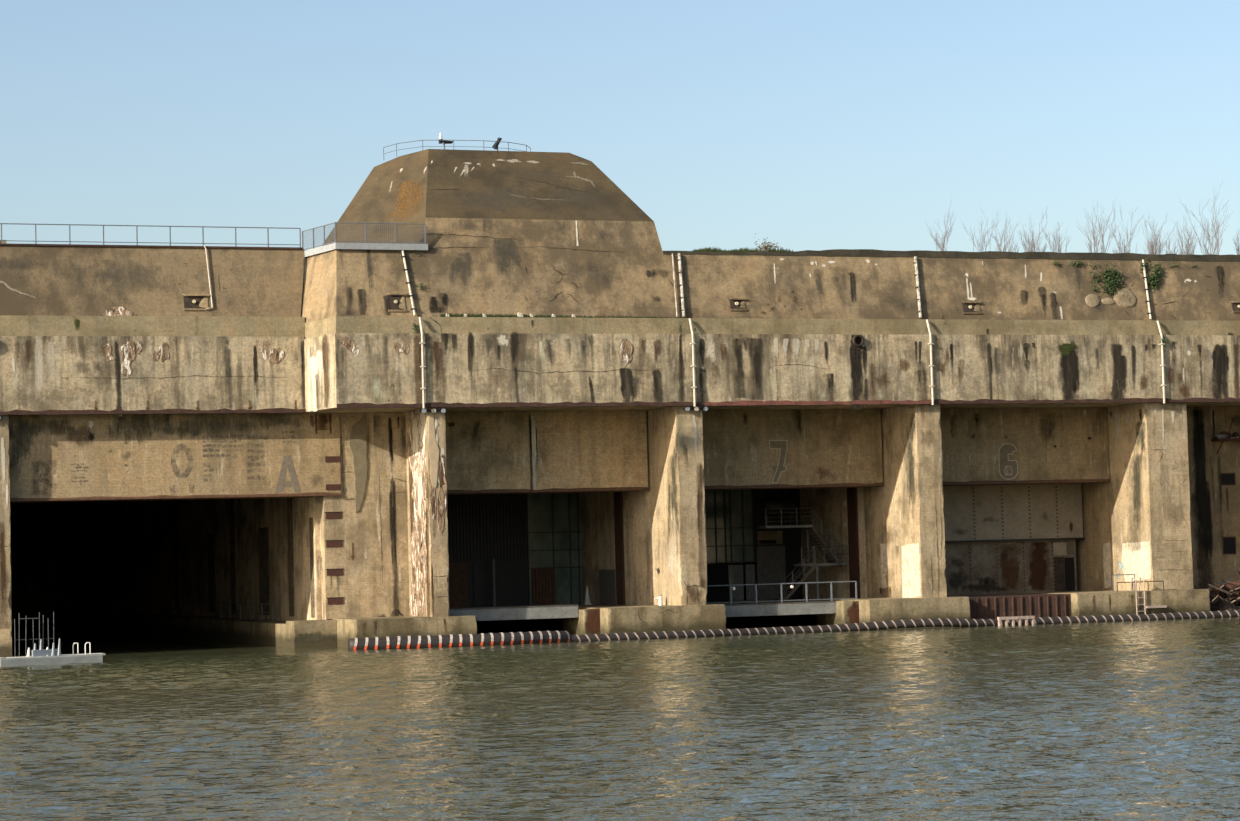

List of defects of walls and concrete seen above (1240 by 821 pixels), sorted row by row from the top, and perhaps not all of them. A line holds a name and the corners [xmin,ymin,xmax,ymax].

spalling [99,341,170,376]
leakage [109,341,247,443]
spalling [260,341,285,365]
leakage [620,368,635,403]
leakage [733,338,788,400]
leakage [824,341,833,400]
leakage [850,335,886,410]
leakage [1059,344,1086,416]
leakage [1110,344,1156,416]
leakage [375,332,473,627]
leakage [1171,333,1239,589]
rust [1004,543,1047,589]